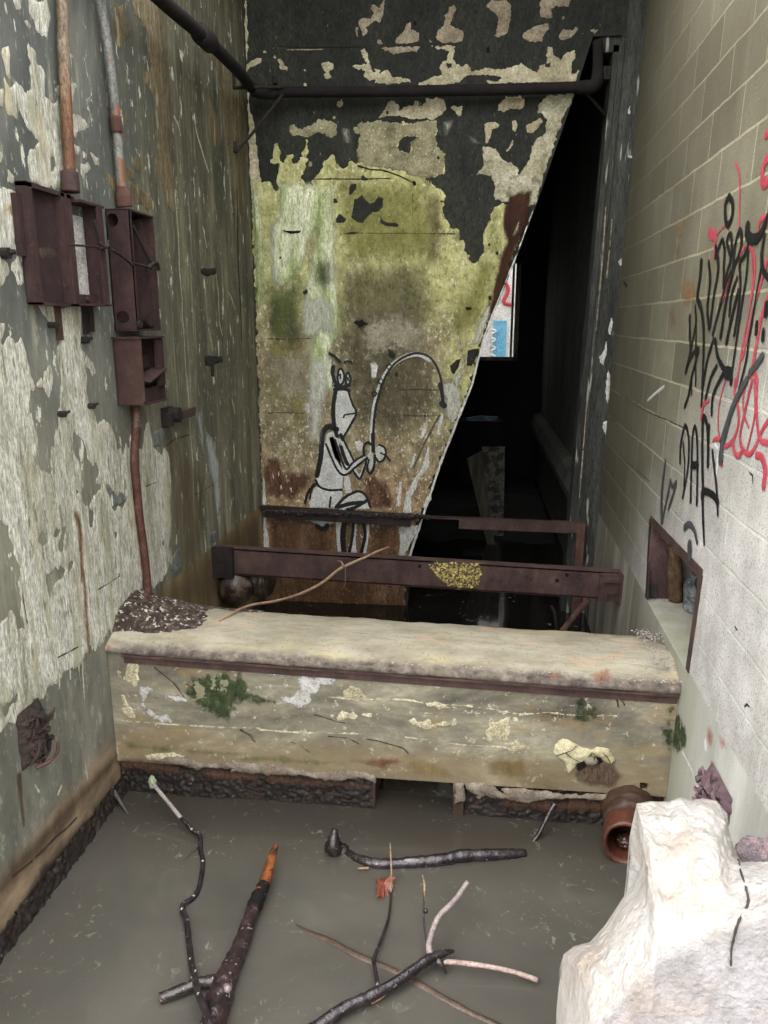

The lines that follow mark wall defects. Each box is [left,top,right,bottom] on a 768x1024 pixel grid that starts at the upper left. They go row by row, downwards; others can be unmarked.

peeling [0,0,175,213]
peeling [0,151,24,287]
flaking render [201,0,598,556]
rust [488,191,530,320]
leakage [269,349,327,440]
leakage [351,278,464,513]
rust [75,512,90,650]
peeling [0,337,182,732]
rust [266,578,402,606]
rust [262,459,432,555]
leakage [399,525,419,556]
leakage [0,760,189,891]